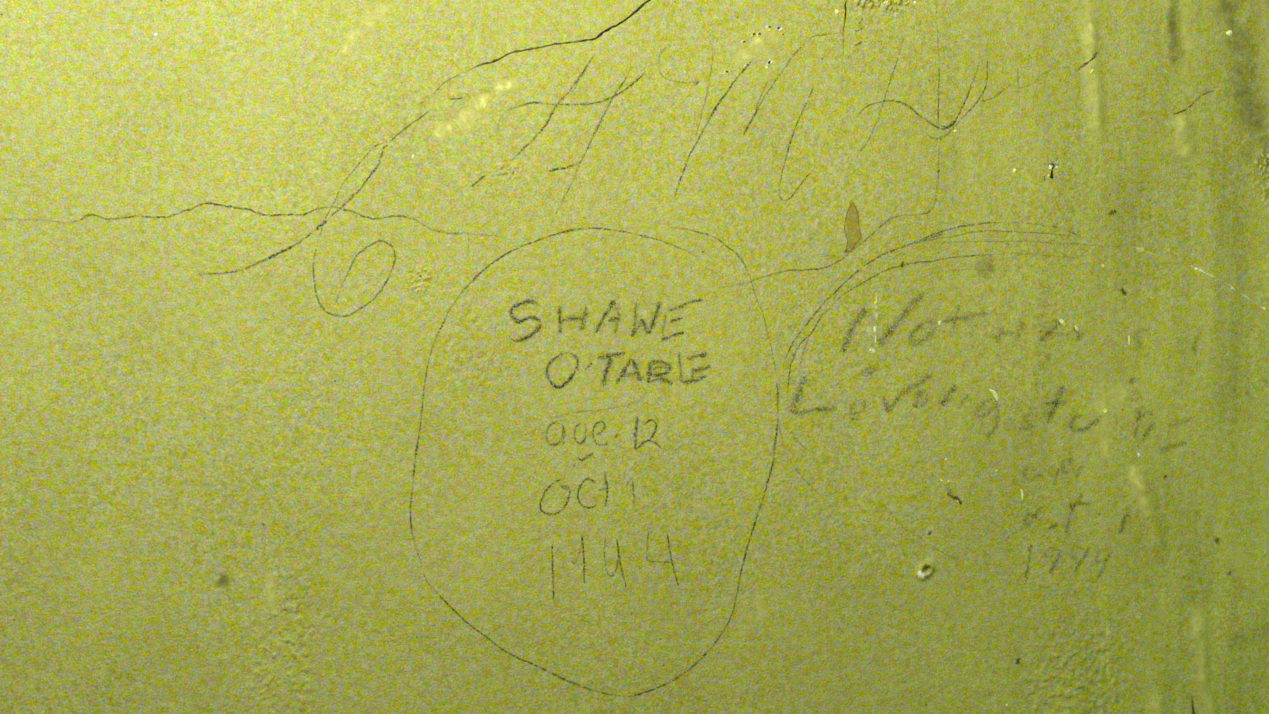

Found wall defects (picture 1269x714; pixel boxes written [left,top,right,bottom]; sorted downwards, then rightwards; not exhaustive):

crack [477,0,661,66]
crack [839,0,854,24]